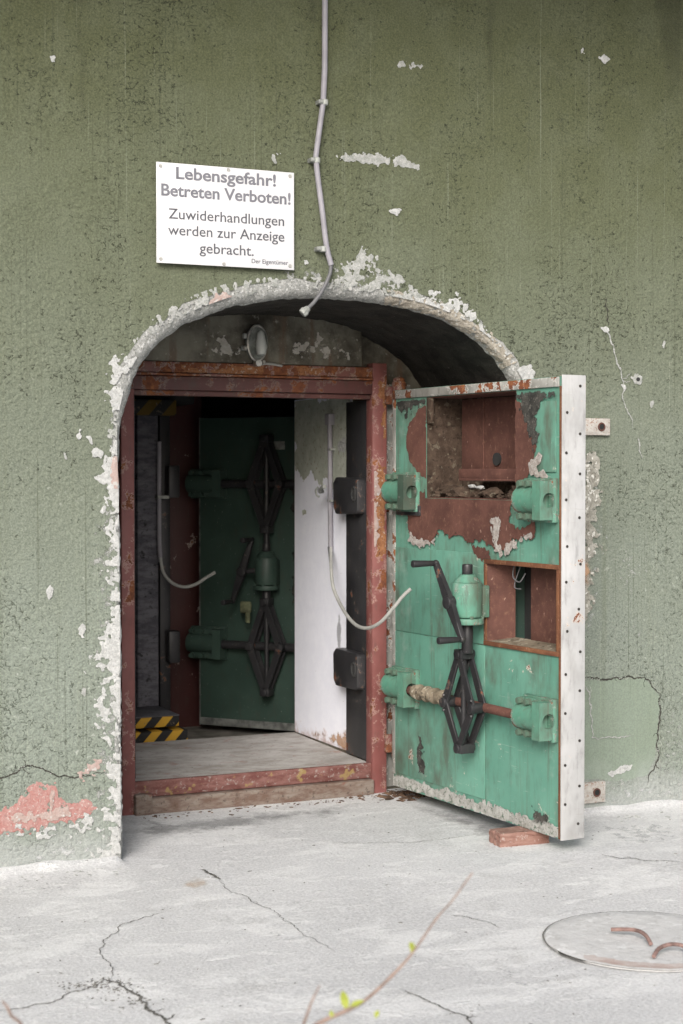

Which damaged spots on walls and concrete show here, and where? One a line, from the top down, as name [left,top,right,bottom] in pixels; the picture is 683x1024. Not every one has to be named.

corrosion [181,364,264,374]
peeling [0,246,558,858]
corrosion [375,462,386,561]
corrosion [406,400,537,551]
spalling [585,451,607,625]
corrosion [330,734,346,748]
crack [585,675,662,783]
crack [201,869,333,950]
crack [10,910,175,1024]